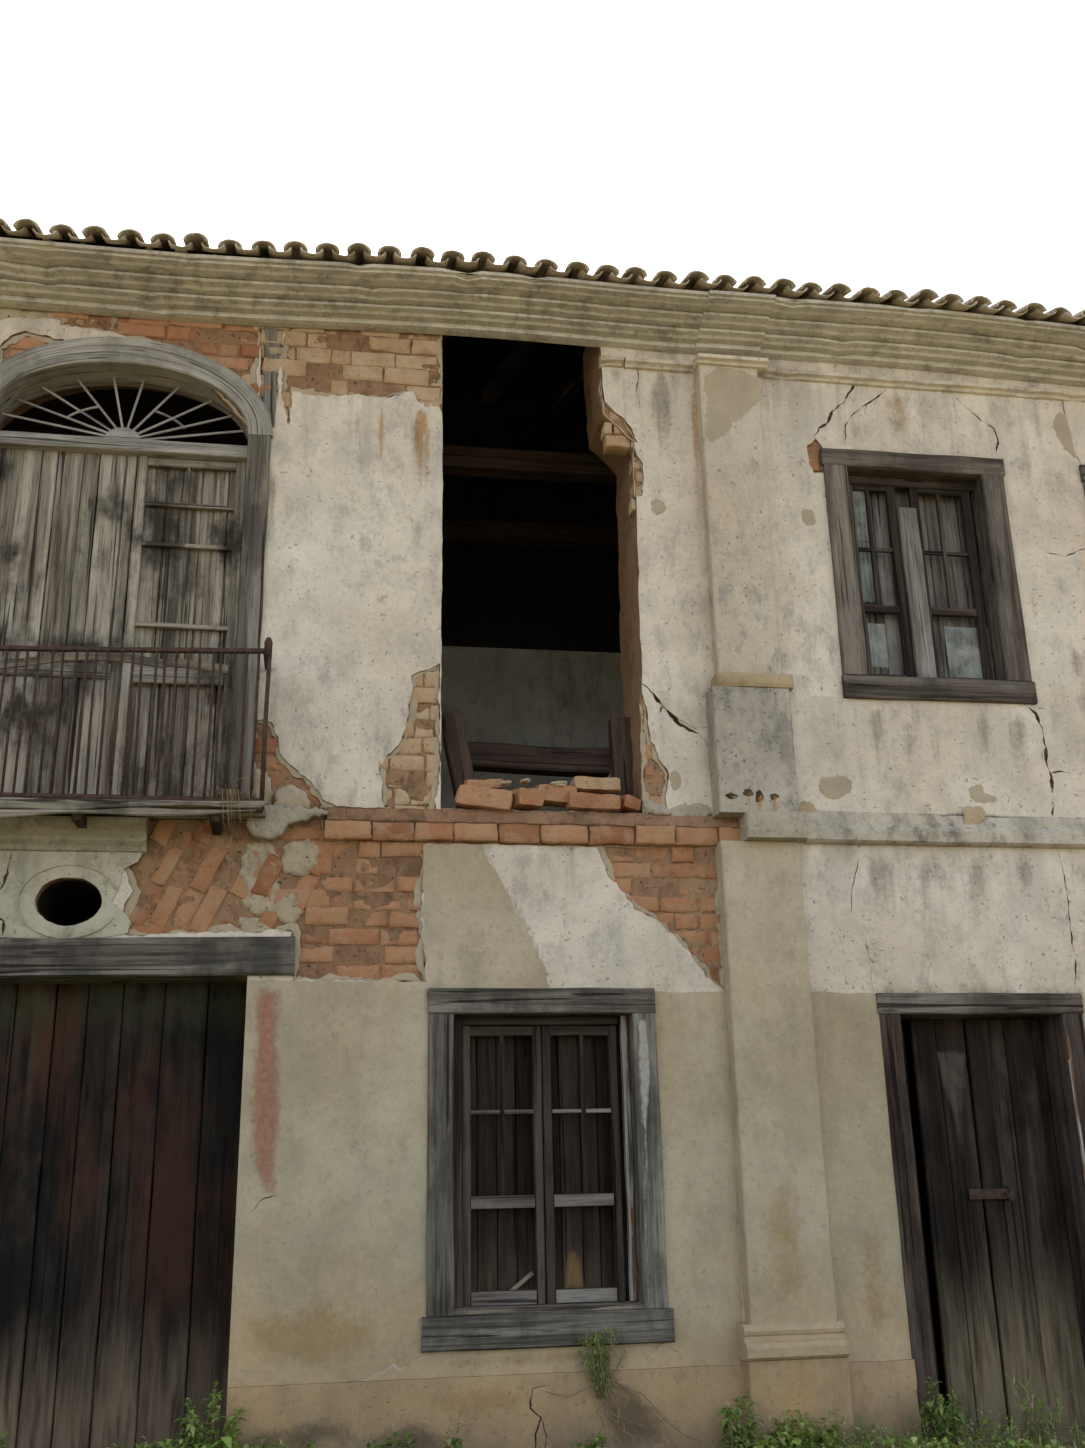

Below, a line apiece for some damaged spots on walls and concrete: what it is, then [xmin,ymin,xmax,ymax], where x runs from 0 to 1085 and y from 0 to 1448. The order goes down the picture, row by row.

flaking render [0,307,443,429]
crack [814,386,883,439]
flaking render [807,440,823,473]
crack [641,684,708,746]
flaking render [123,665,741,990]
flaking render [725,789,779,812]
crack [1029,708,1077,815]
crack [0,853,12,935]